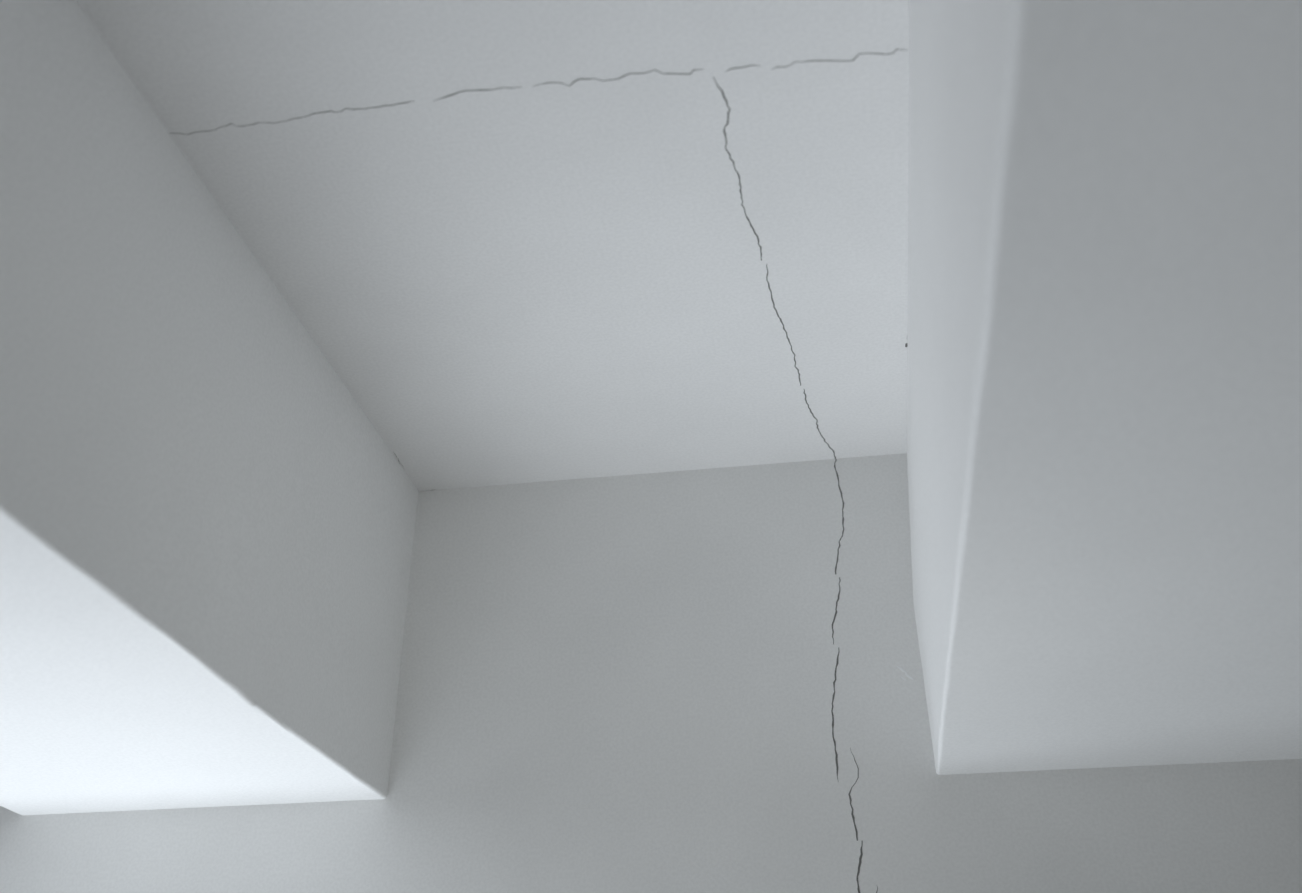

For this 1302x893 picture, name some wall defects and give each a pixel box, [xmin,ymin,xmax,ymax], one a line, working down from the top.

crack [169,48,908,893]